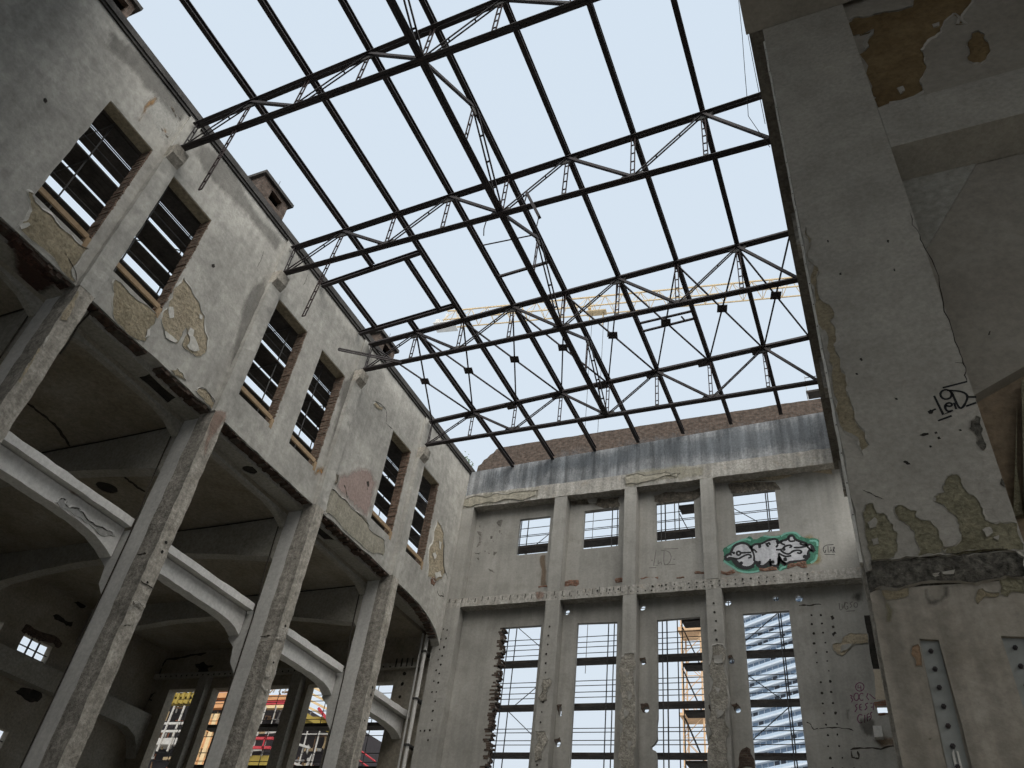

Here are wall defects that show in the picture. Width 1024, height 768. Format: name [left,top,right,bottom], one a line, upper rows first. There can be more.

flaking render [849,0,991,108]
flaking render [0,220,209,358]
spalling [805,228,871,457]
crack [27,403,70,446]
flaking render [463,490,538,507]
leakage [490,419,814,483]
spalling [862,380,1024,604]
spalling [321,516,388,577]
spalling [427,519,631,603]